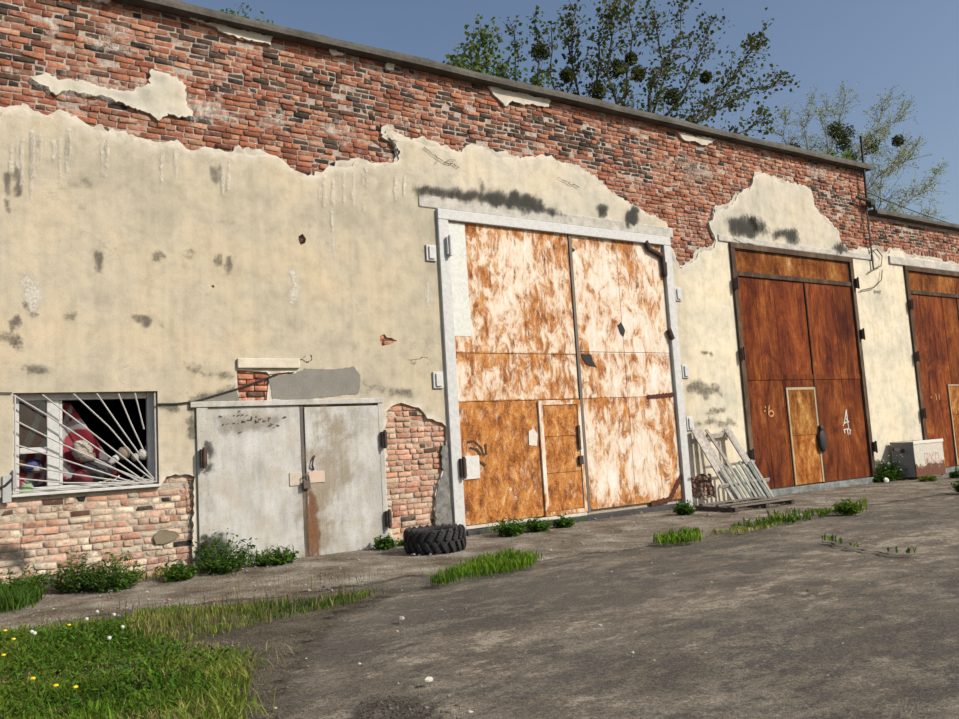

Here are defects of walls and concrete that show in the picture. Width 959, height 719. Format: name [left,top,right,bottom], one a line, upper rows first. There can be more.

flaking render [0,0,959,268]
damp [5,131,41,205]
damp [417,184,562,216]
damp [626,206,639,228]
damp [730,215,798,244]
flaking render [218,370,294,434]
flaking render [385,403,445,541]
flaking render [0,476,194,590]
corrosion [307,490,320,556]